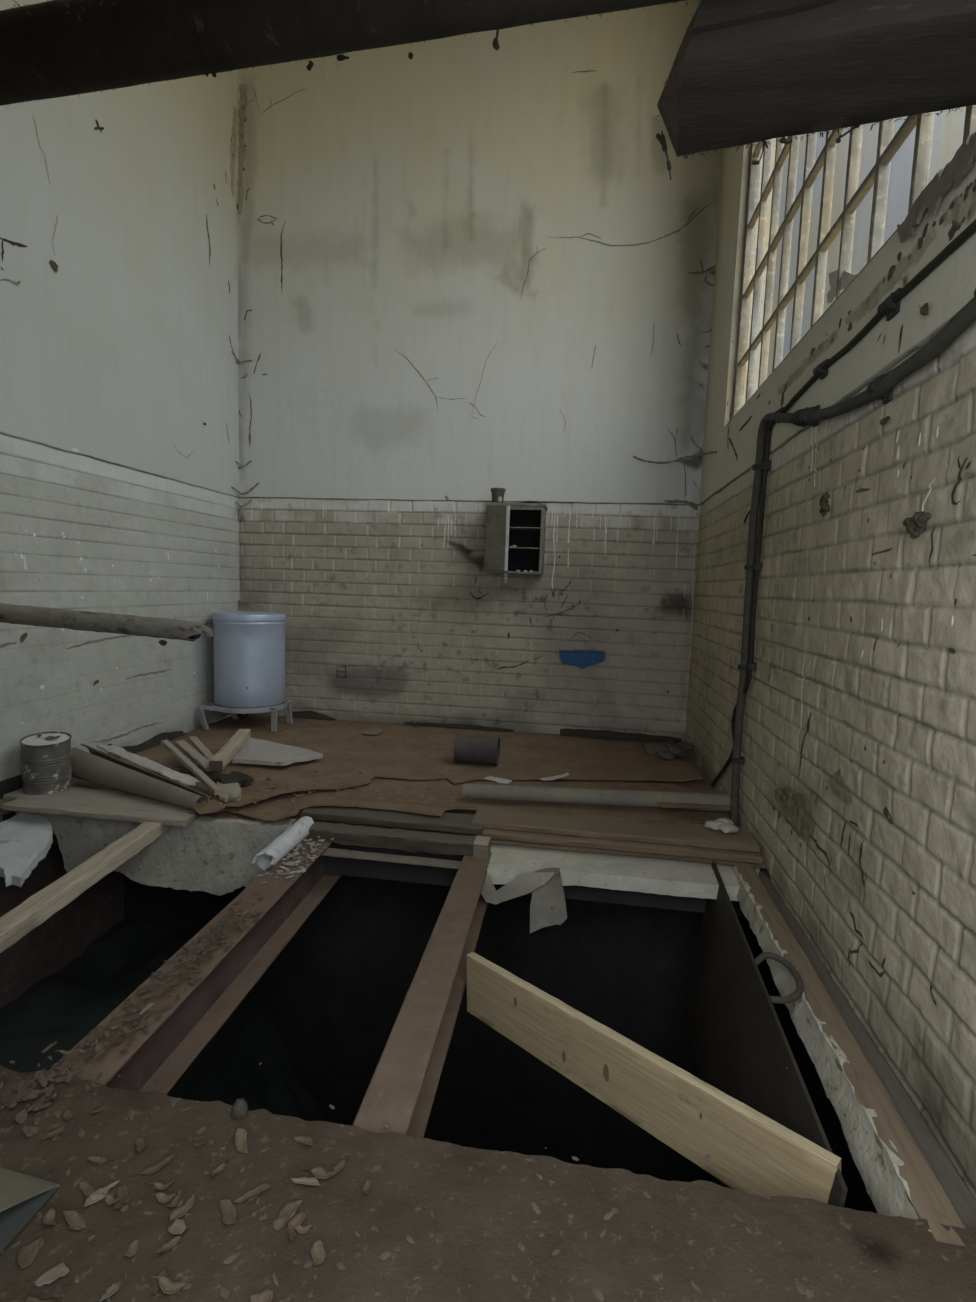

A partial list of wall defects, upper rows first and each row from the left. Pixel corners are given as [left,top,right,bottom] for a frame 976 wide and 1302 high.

crack [520,199,717,301]
spalling [769,179,976,407]
crack [395,342,498,419]
crack [811,820,886,977]